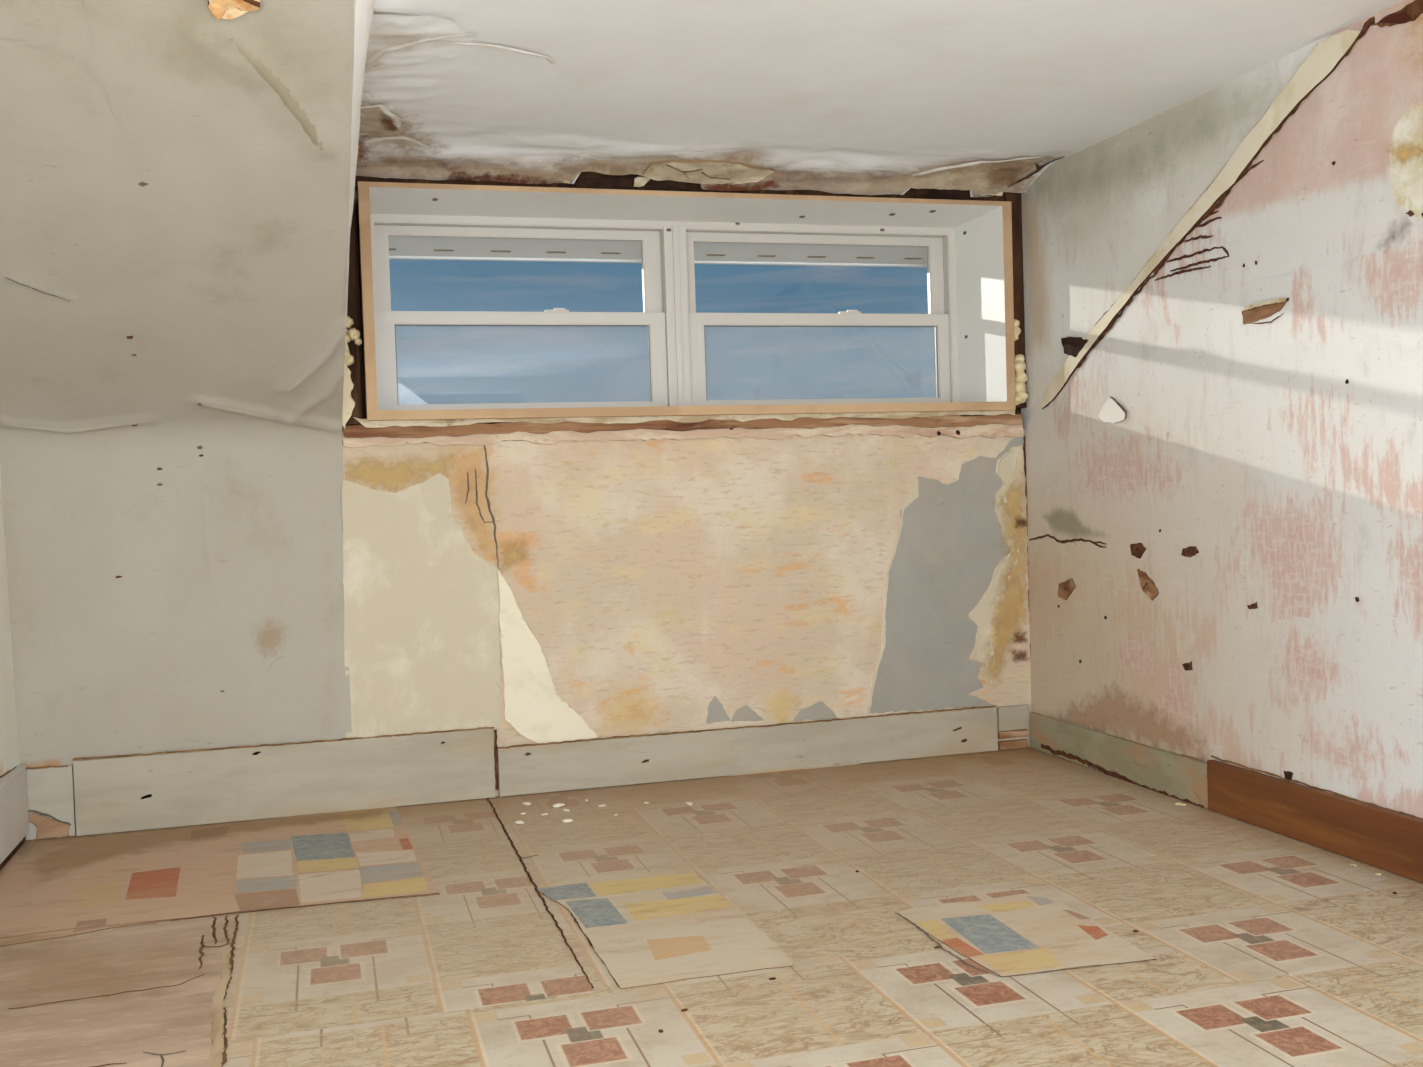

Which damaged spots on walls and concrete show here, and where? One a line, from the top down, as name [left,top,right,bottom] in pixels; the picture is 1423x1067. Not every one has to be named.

flaking render [558,176,691,191]
flaking render [1215,182,1423,351]
flaking render [1061,337,1088,357]
crack [465,445,499,570]
flaking render [866,429,1025,714]
crack [1029,534,1106,548]
peeling [1069,397,1198,527]
flaking render [706,696,765,724]
flaking render [793,701,838,722]
peeling [1099,543,1205,755]